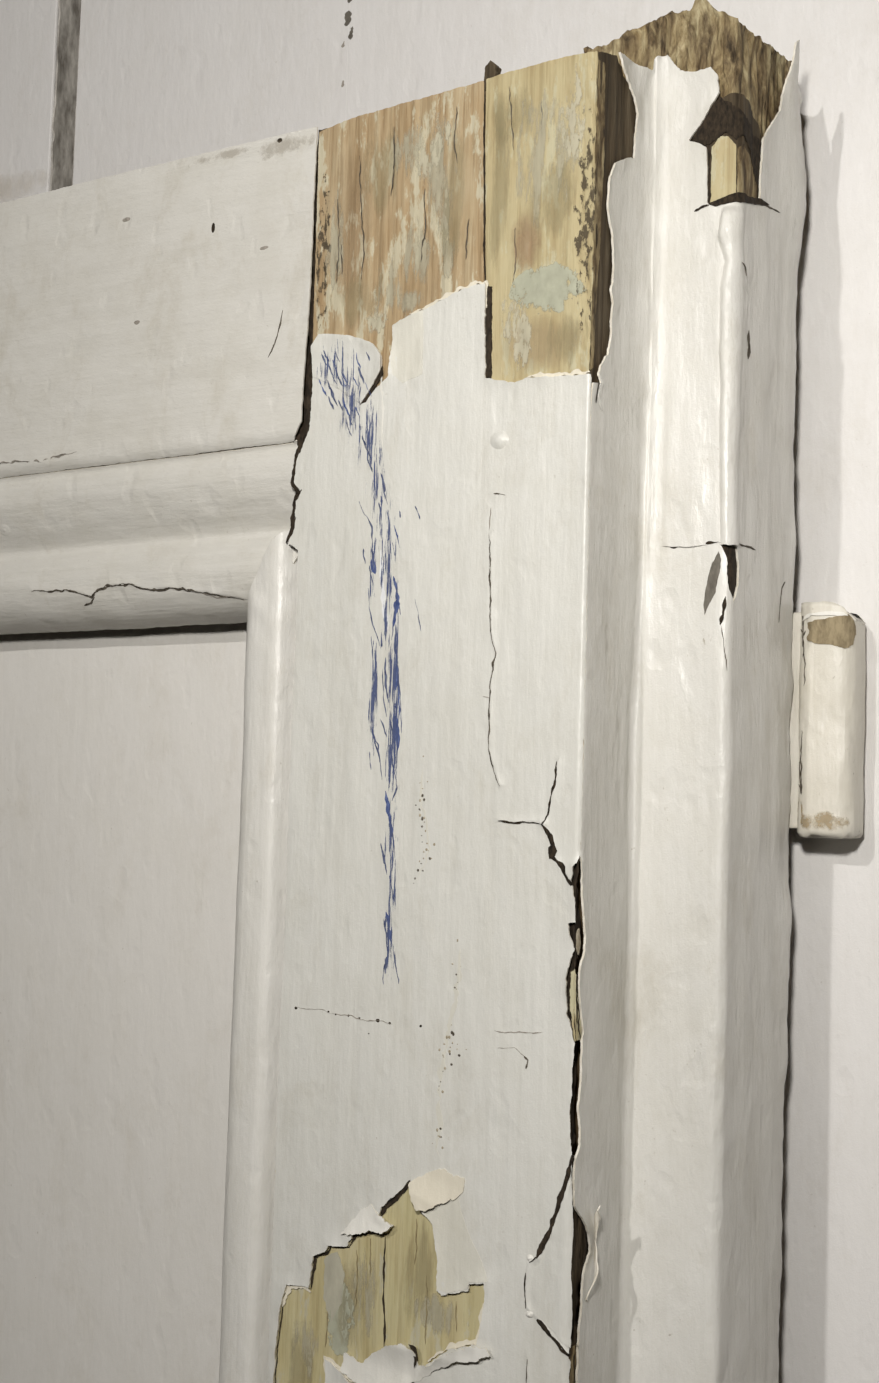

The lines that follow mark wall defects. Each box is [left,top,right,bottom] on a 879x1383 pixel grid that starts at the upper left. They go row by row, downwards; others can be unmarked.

peeling [311,51,636,410]
peeling [690,93,780,213]
crack [32,583,243,606]
crack [483,493,504,786]
peeling [274,939,490,1383]
crack [496,761,582,1383]